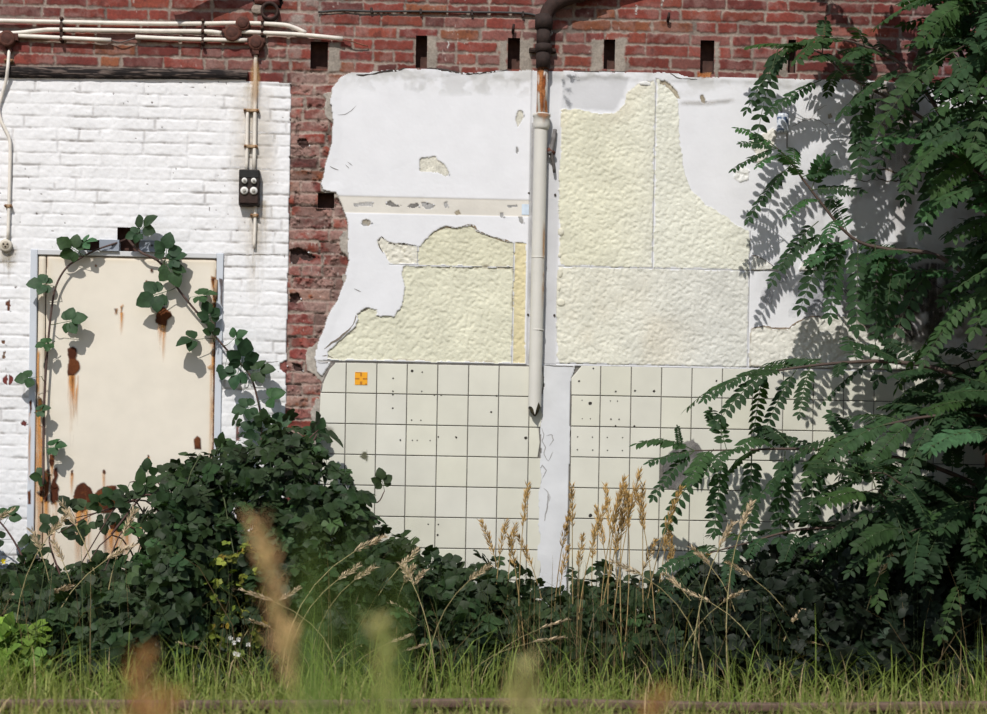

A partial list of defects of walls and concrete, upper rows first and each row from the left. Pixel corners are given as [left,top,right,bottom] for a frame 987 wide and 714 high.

corrosion [536,67,549,117]
flaking render [660,80,681,99]
flaking render [420,156,450,177]
hole [318,193,334,208]
spalling [290,248,316,264]
corrosion [155,307,172,336]
corrosion [67,347,80,398]
peeling [280,361,304,374]
corrosion [28,398,59,514]
corrosion [71,470,141,548]